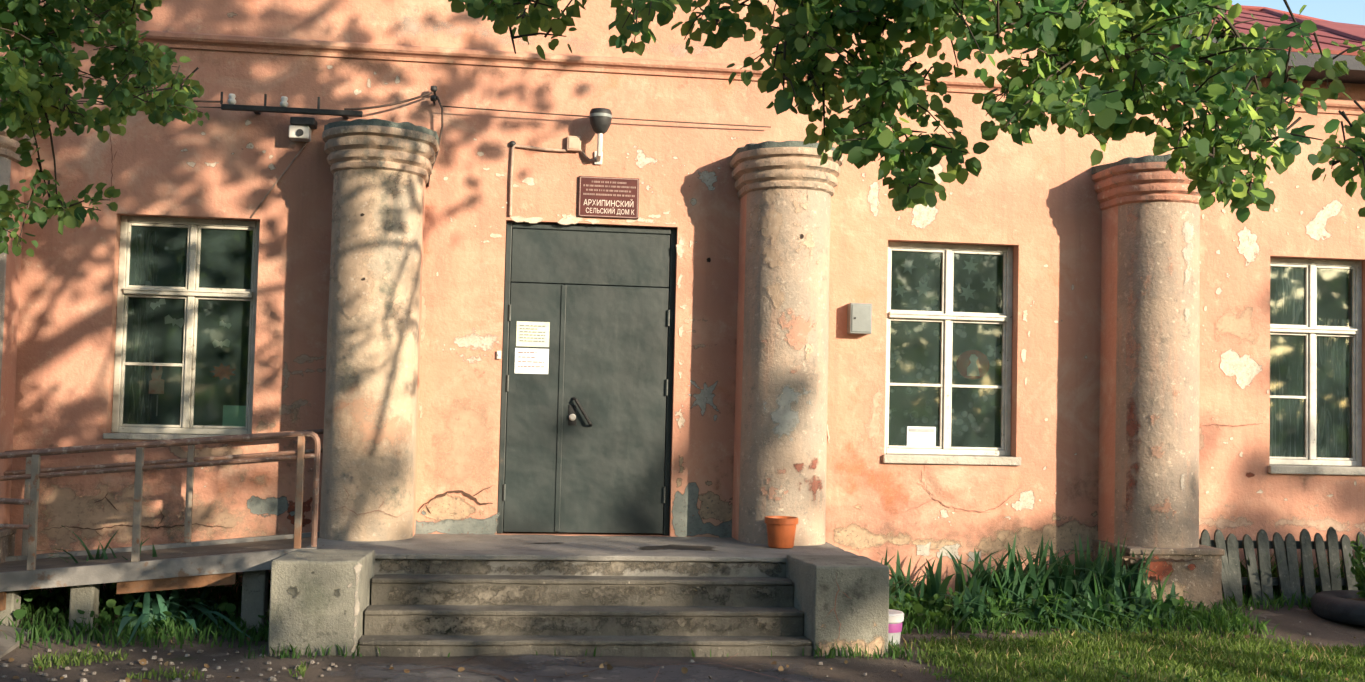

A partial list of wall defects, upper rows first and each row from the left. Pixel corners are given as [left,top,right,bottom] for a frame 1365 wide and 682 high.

peeling [330,169,413,345]
peeling [1171,214,1205,283]
peeling [1233,204,1281,266]
peeling [1300,199,1360,241]
peeling [392,295,427,342]
peeling [442,327,500,363]
peeling [675,304,719,428]
peeling [1185,273,1262,389]
crack [334,485,493,517]
spalling [415,494,499,534]
spalling [672,457,733,538]